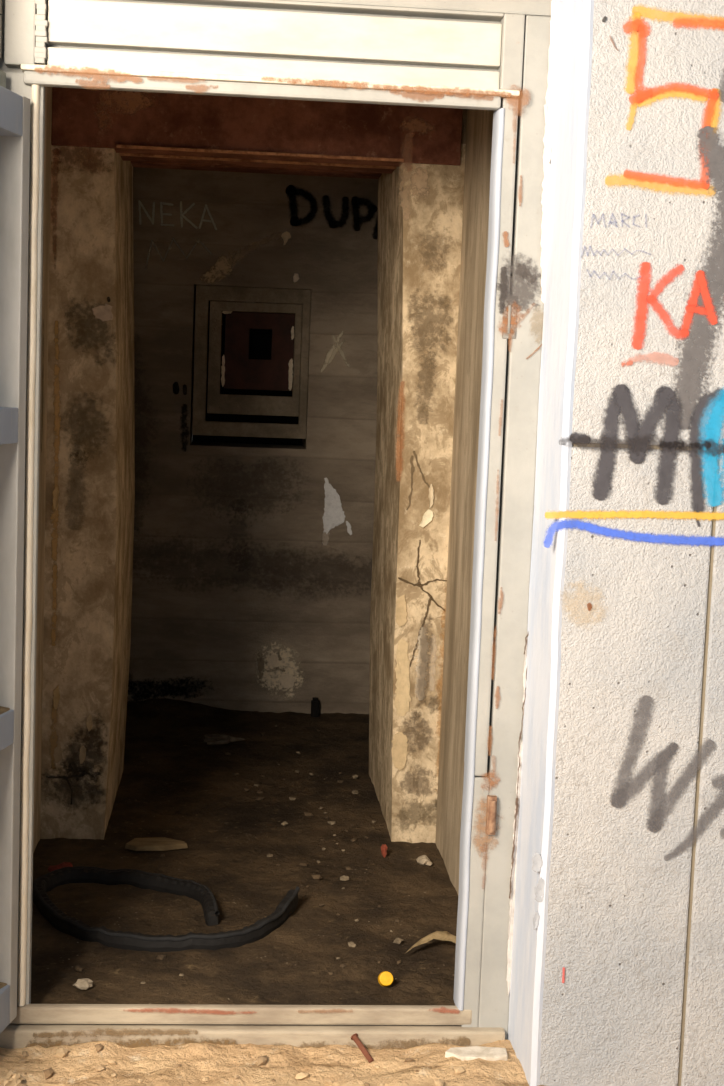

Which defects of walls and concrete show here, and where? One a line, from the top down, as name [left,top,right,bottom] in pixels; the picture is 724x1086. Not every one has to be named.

corrosion [261,77,530,115]
water stain [499,264,536,313]
peeling [322,477,352,535]
crack [406,451,430,510]
crack [398,540,447,667]
spalling [256,640,304,699]
mould [43,714,107,809]
corrosion [482,772,500,788]